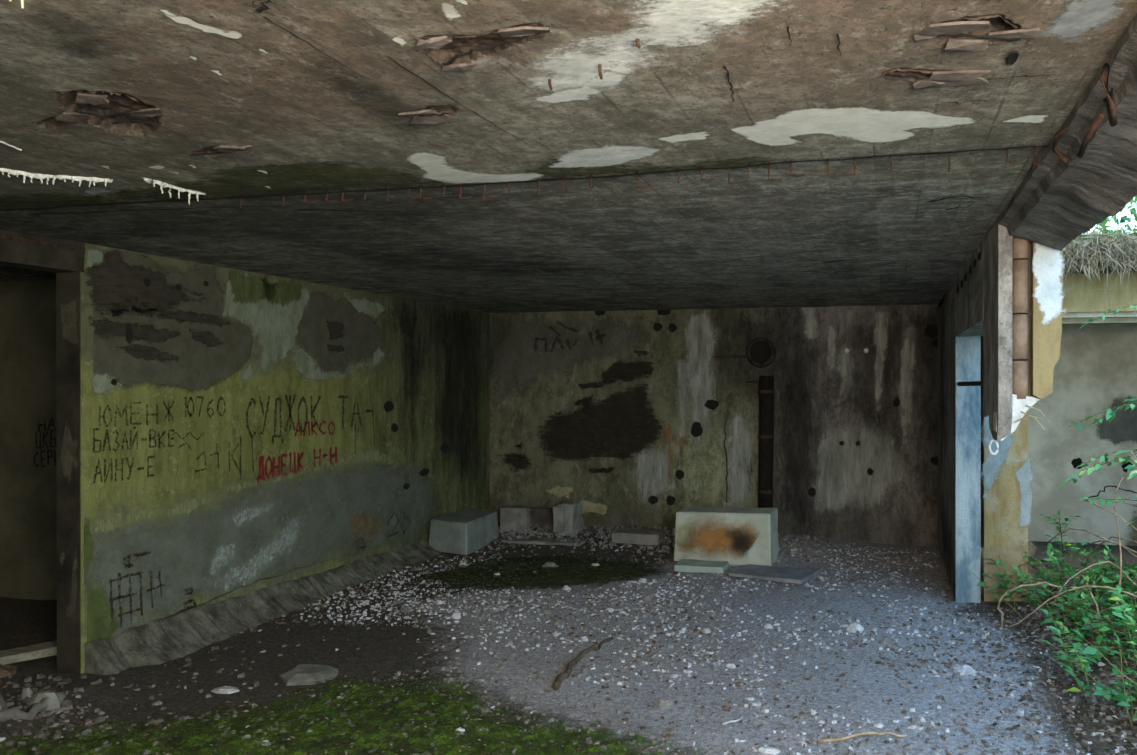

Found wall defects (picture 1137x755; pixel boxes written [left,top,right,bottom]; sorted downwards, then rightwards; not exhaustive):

spalling [37,89,162,137]
spalling [414,23,550,72]
damp [521,0,777,103]
spalling [881,67,991,89]
spalling [913,0,1039,52]
damp [1046,0,1122,37]
damp [0,132,708,238]
peeling [61,248,253,394]
peeling [297,292,383,375]
damp [635,312,717,501]
damp [723,414,753,507]
peeling [1098,396,1137,444]